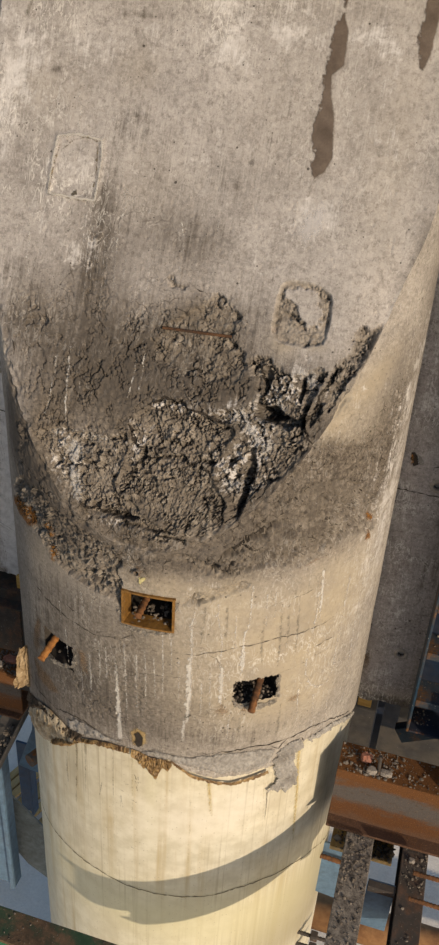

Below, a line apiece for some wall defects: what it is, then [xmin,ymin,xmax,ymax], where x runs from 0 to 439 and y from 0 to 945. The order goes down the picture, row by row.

damp [417,0,439,70]
damp [310,0,348,178]
spalling [270,279,334,350]
spalling [14,291,385,637]
corrosion [14,495,56,561]
spalling [38,634,77,669]
spalling [232,675,281,714]
peeling [66,718,120,742]
spalling [131,729,146,747]
peeling [268,711,354,793]